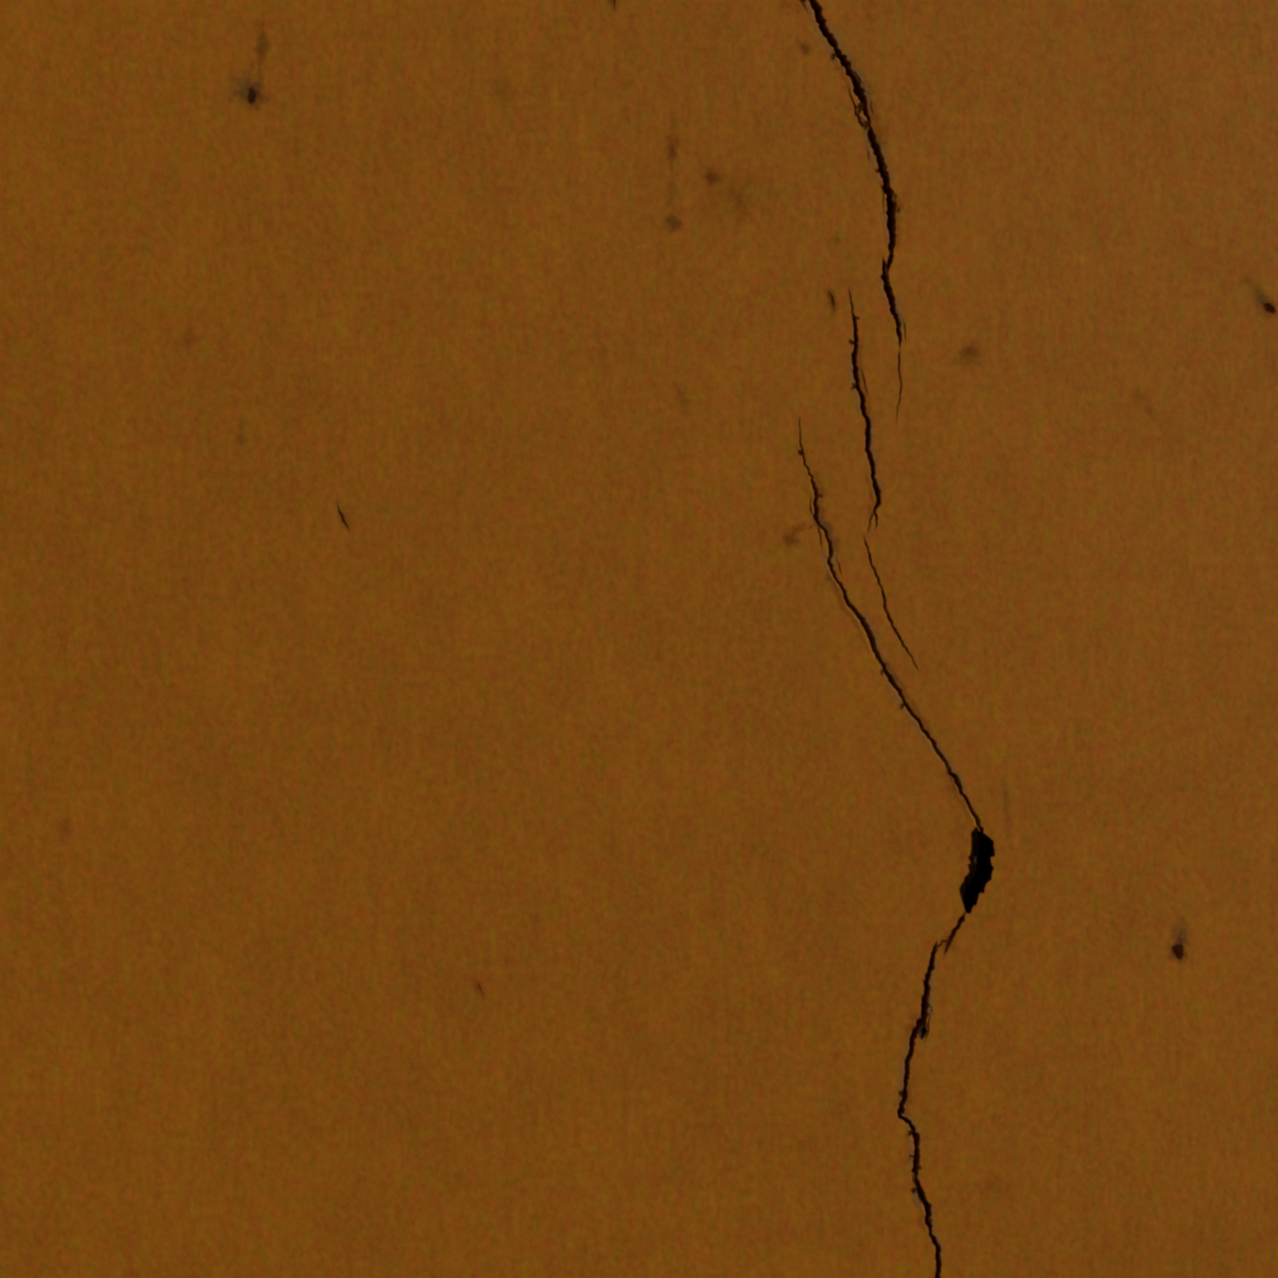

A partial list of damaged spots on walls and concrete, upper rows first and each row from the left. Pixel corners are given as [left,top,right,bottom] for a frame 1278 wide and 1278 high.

crack [797,0,981,832]
crack [896,911,966,1278]